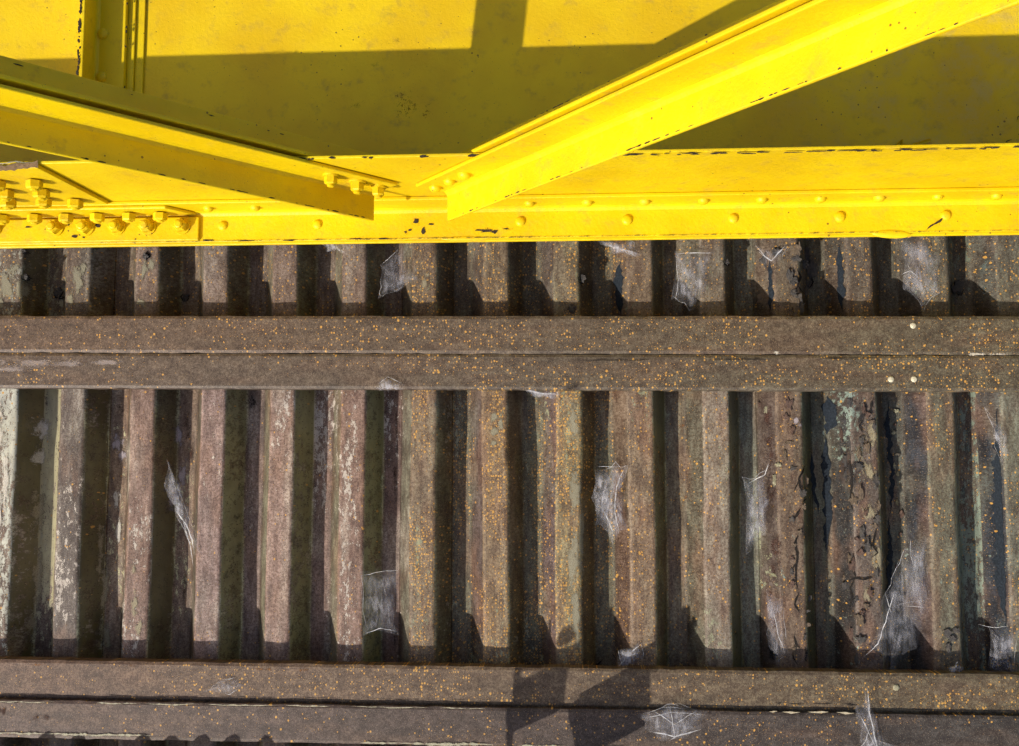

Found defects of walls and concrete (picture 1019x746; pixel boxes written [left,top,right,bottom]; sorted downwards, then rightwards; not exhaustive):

peeling [0,396,9,529]
peeling [772,398,809,509]
peeling [854,411,880,486]
peeling [841,494,884,649]